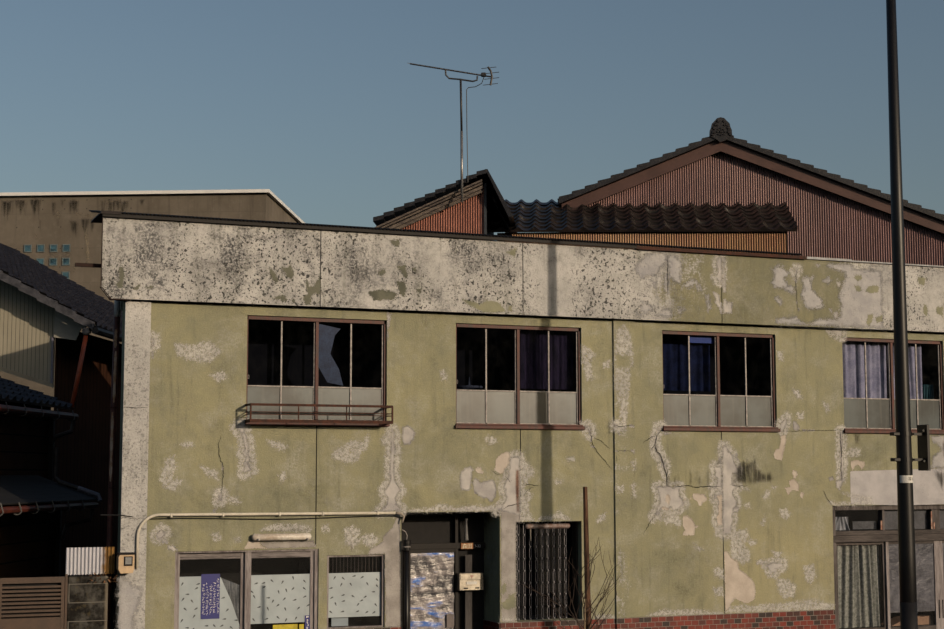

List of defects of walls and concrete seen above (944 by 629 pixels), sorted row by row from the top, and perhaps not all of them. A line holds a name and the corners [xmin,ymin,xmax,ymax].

peeling [632,251,734,314]
peeling [769,261,885,343]
peeling [174,341,228,383]
peeling [579,323,635,448]
peeling [157,441,196,491]
peeling [197,464,243,513]
peeling [229,415,289,481]
peeling [331,421,570,627]
crack [586,425,742,488]
peeling [646,419,835,617]
leakage [737,464,770,481]
peeling [930,434,944,471]